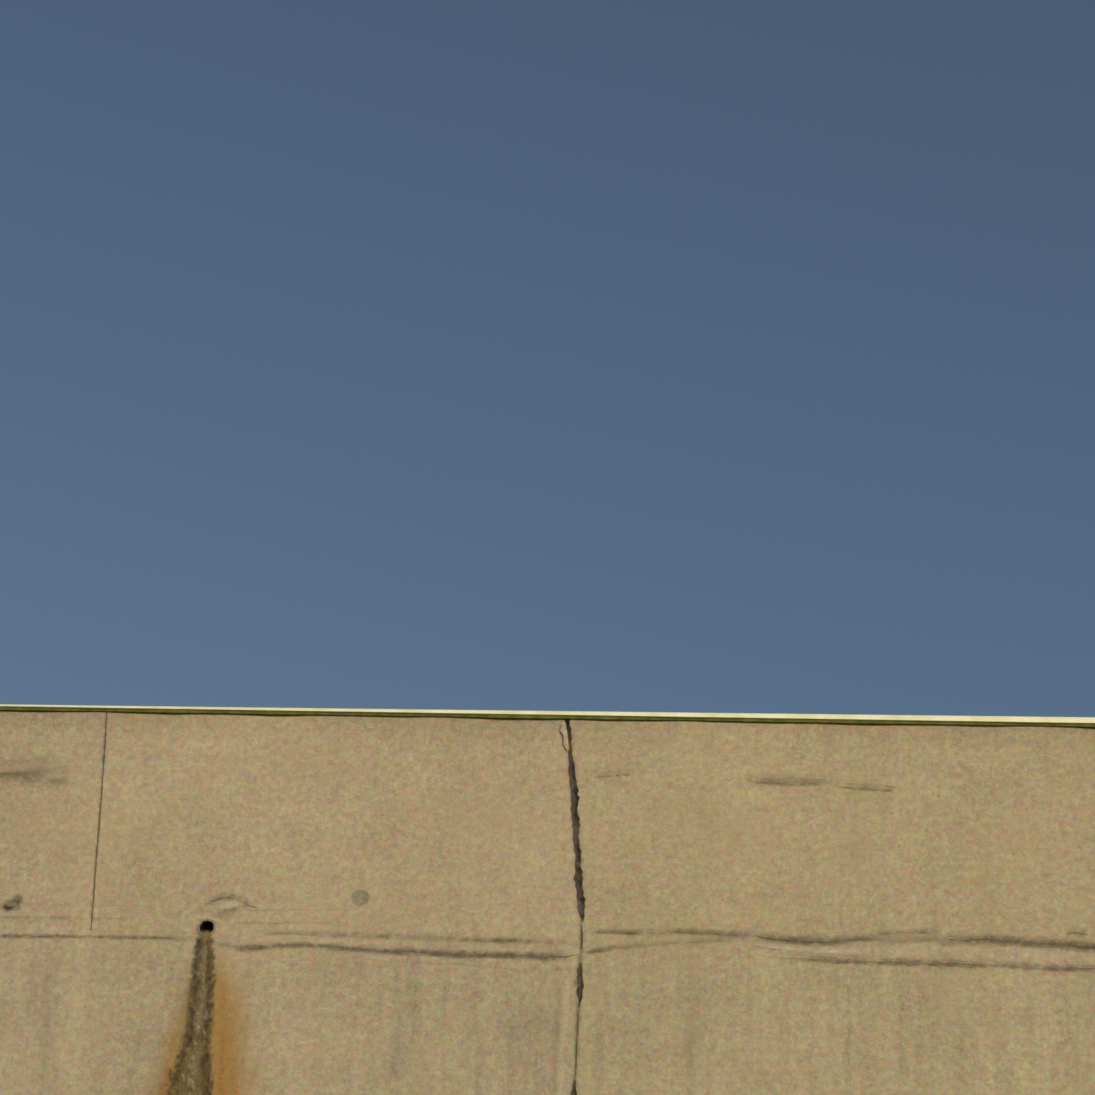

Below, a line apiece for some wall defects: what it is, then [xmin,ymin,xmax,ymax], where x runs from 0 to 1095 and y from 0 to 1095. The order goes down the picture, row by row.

leakage [167,931,216,1095]
crack [229,720,638,1095]
crack [678,929,1095,969]